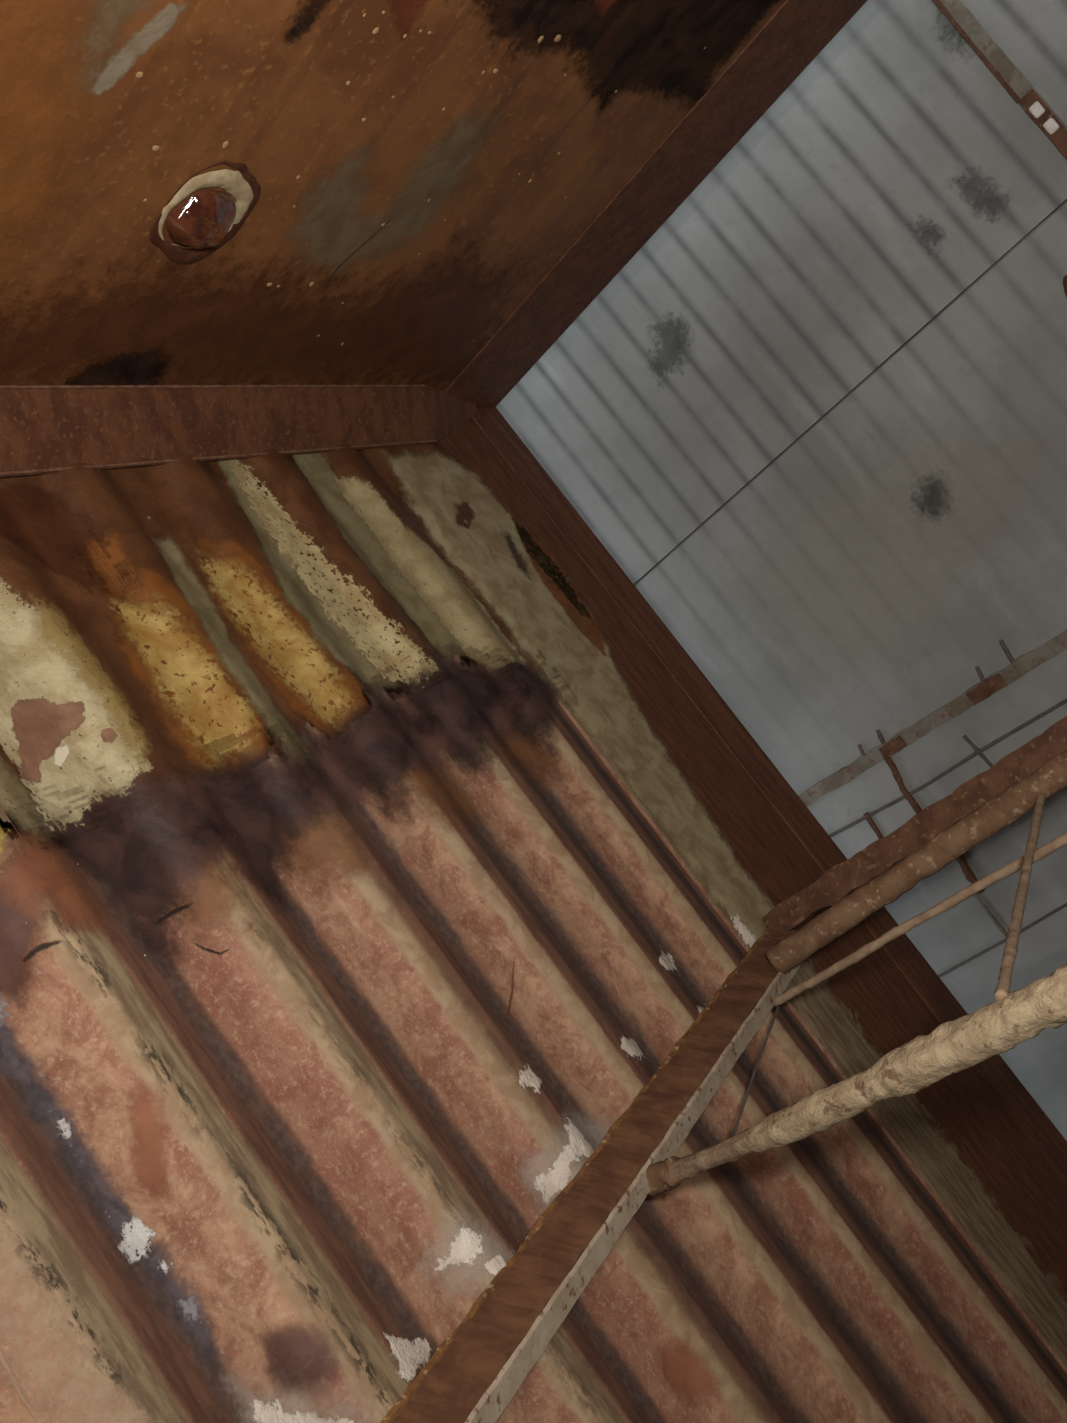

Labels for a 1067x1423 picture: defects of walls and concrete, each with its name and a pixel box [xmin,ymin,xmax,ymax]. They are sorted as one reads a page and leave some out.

rust [150,161,261,265]
water stain [286,0,329,41]
water stain [474,0,780,112]
water stain [651,313,688,375]
water stain [957,176,1008,216]
peeling [0,577,153,874]
rust [0,443,561,995]
water stain [45,662,556,962]
peeling [112,451,774,939]
rust [380,924,773,1423]